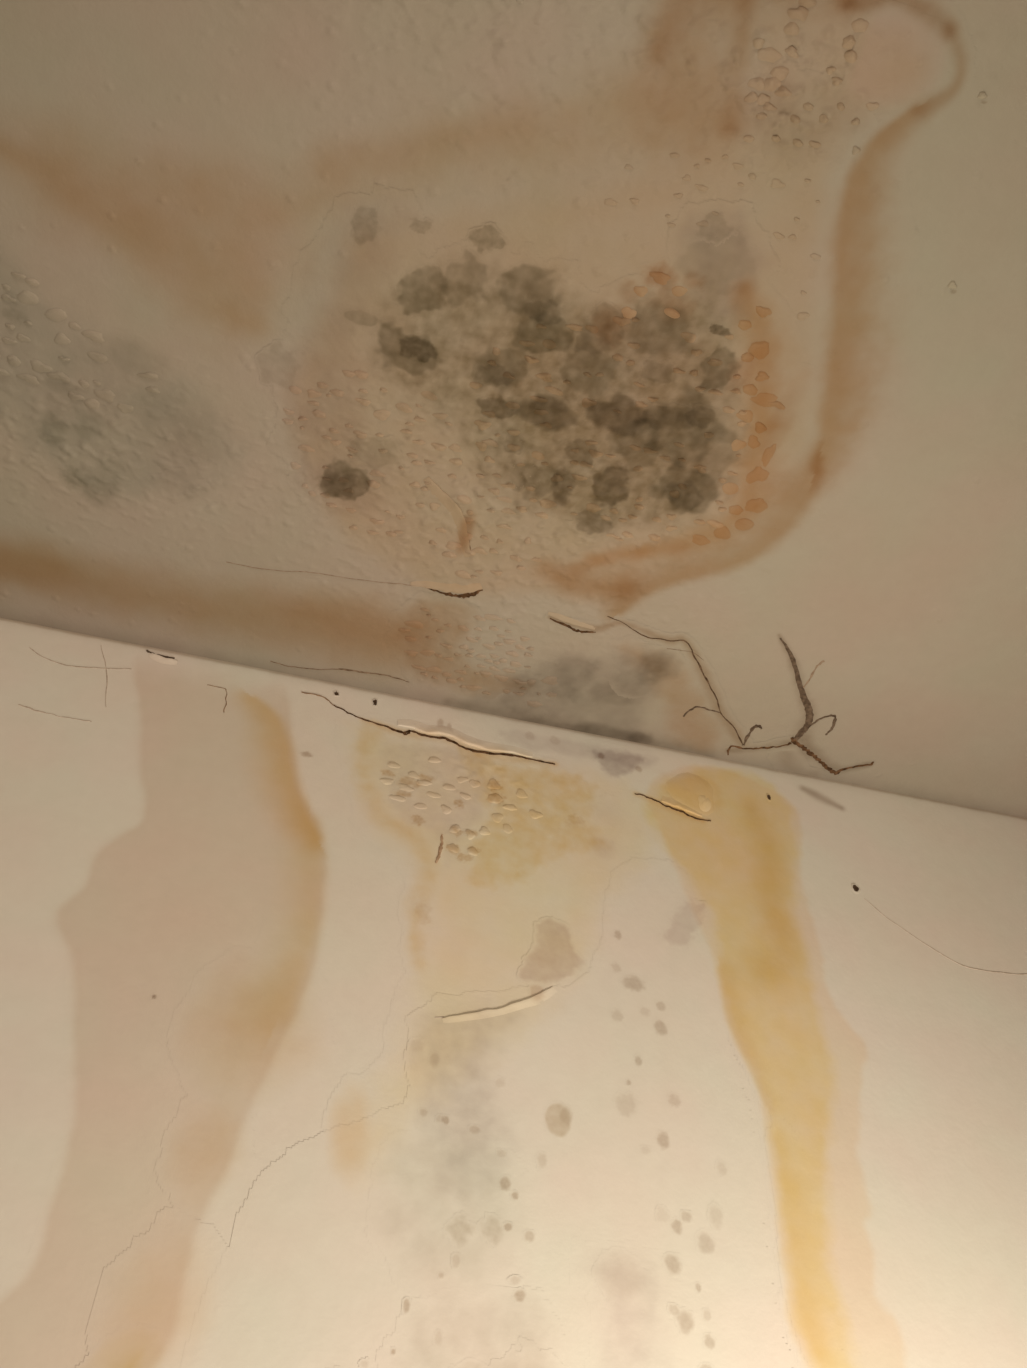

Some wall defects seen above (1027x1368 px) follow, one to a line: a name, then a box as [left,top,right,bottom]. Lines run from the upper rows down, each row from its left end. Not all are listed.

crack [270,661,562,770]
damp [0,649,914,1368]
damp [0,0,977,759]